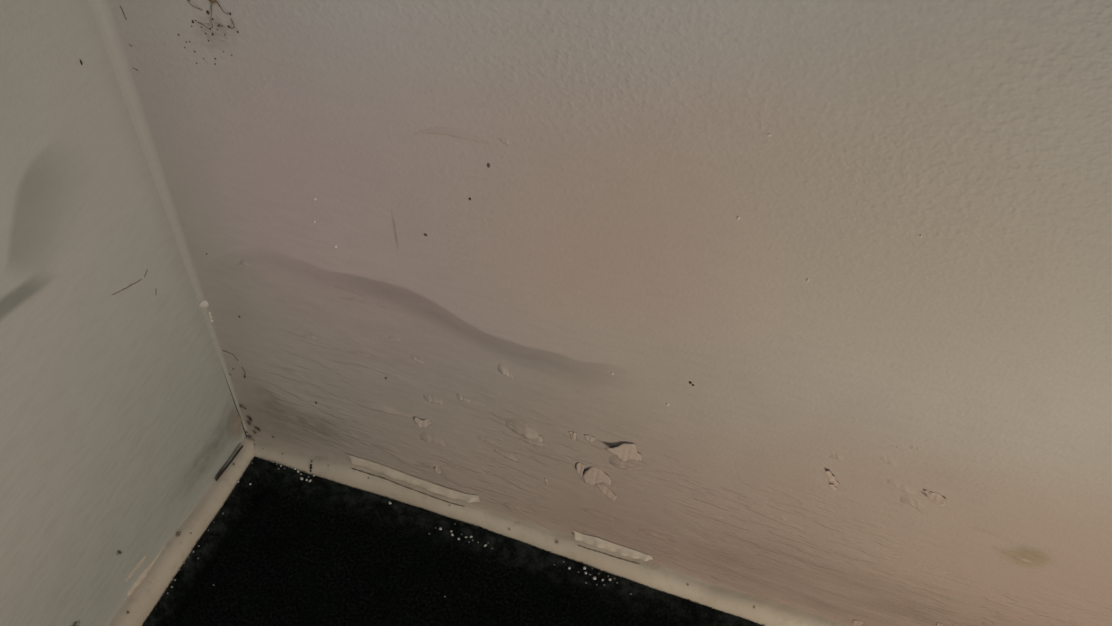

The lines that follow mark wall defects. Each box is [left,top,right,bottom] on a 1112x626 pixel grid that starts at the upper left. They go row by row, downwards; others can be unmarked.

peeling [569,431,642,462]
peeling [346,454,480,503]